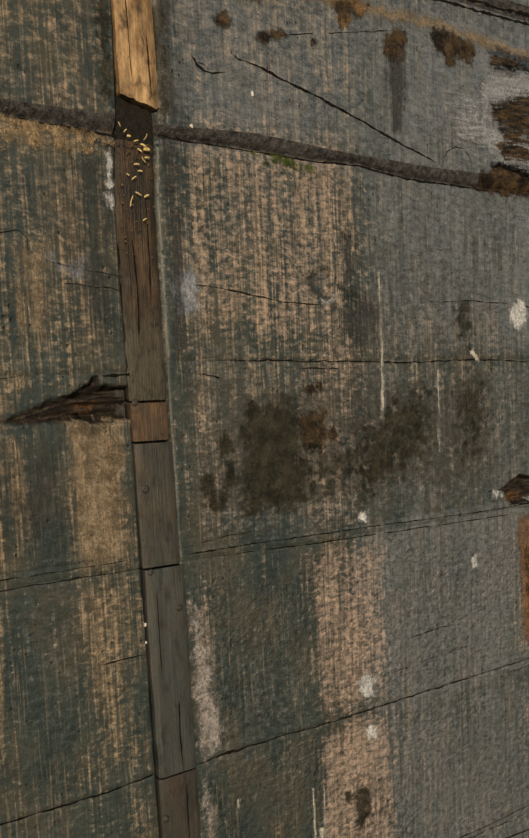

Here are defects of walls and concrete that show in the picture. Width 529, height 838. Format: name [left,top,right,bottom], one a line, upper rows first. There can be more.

crack [164,37,519,194]
water stain [365,5,529,132]
water stain [446,73,529,199]
water stain [0,114,115,321]
water stain [10,237,45,339]
spalling [2,378,130,428]
water stain [200,277,441,517]
water stain [452,378,490,461]
spalling [488,475,529,505]
corrosion [519,517,529,640]
water stain [345,787,371,828]